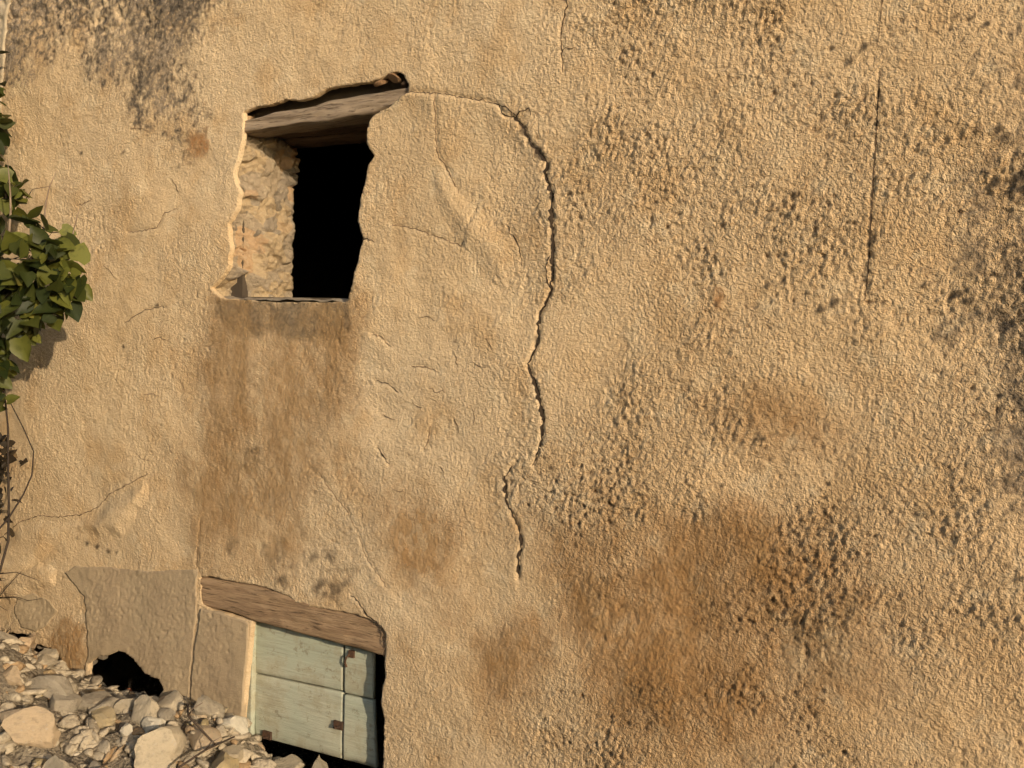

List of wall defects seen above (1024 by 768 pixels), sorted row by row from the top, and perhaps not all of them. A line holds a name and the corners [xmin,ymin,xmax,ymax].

crack [561,0,573,72]
crack [362,224,463,246]
crack [864,71,881,301]
water stain [223,356,314,547]
water stain [218,300,350,432]
crack [408,91,555,577]